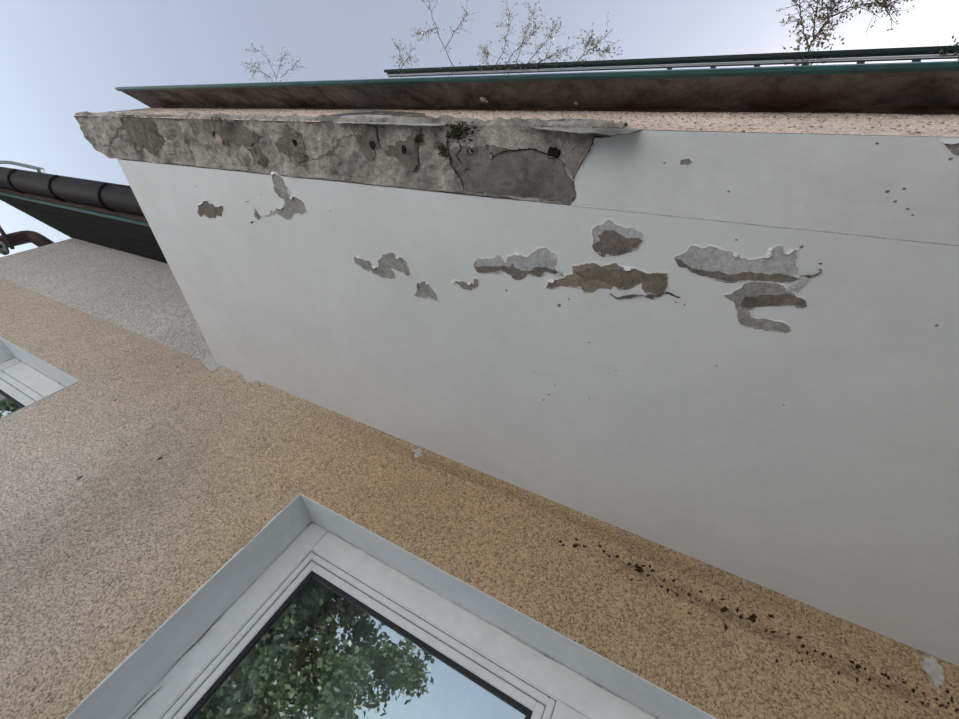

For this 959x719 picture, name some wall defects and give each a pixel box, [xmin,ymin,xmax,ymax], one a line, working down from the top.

spalling [75,110,643,224]
crack [446,133,464,191]
crack [492,148,554,159]
peeling [939,138,959,160]
peeling [354,251,440,303]
peeling [451,218,822,334]